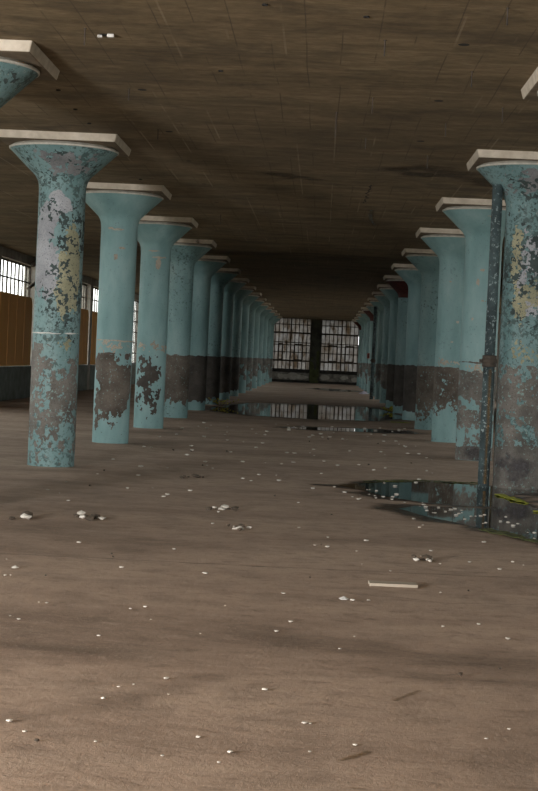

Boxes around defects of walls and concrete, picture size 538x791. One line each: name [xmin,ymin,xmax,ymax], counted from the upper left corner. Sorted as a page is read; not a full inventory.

peeling [21,149,101,466]
peeling [501,168,538,336]
peeling [94,339,308,430]
peeling [340,358,483,461]
peeling [490,339,538,490]